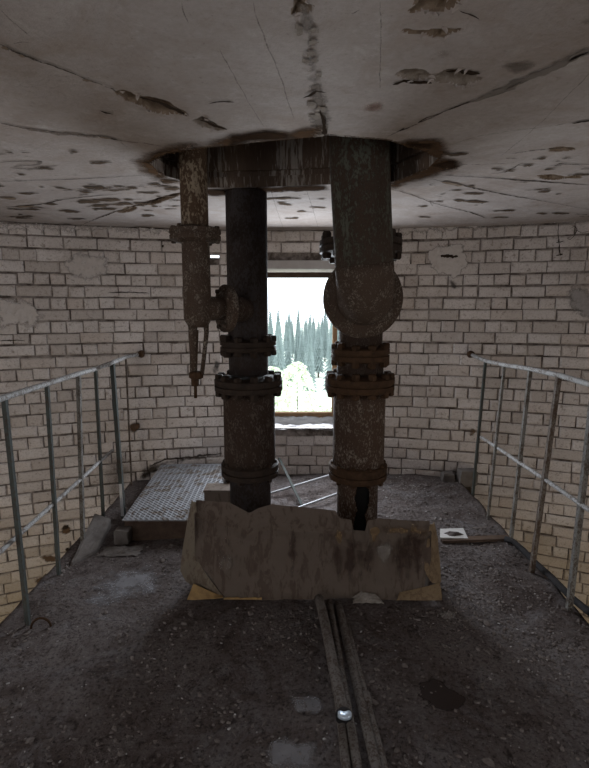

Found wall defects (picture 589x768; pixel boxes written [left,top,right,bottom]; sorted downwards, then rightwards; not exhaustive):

spalling [278,0,330,36]
spalling [389,0,474,43]
crack [0,42,119,94]
spalling [106,87,233,133]
spalling [385,63,496,90]
crack [391,49,589,135]